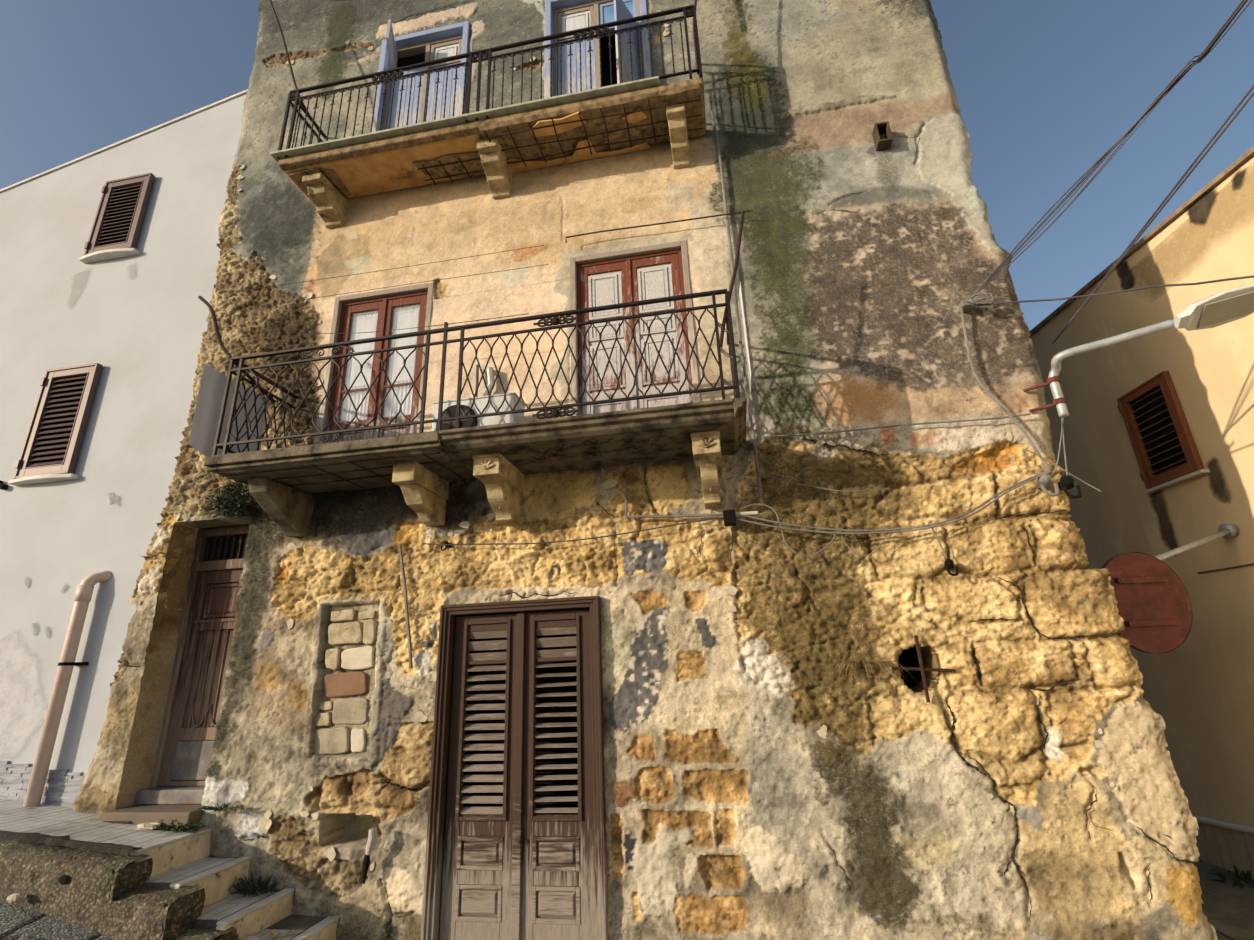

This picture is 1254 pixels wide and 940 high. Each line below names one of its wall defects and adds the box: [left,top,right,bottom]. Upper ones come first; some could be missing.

leakage [240,183,322,436]
spalling [127,165,463,605]
spalling [413,99,703,185]
leakage [710,57,793,172]
leakage [743,205,813,415]
leakage [1116,170,1254,290]
spalling [258,427,1144,934]
leakage [810,742,920,940]
crack [946,700,1032,921]
crack [995,500,1070,561]
crack [973,577,1119,680]
crack [1030,683,1076,749]